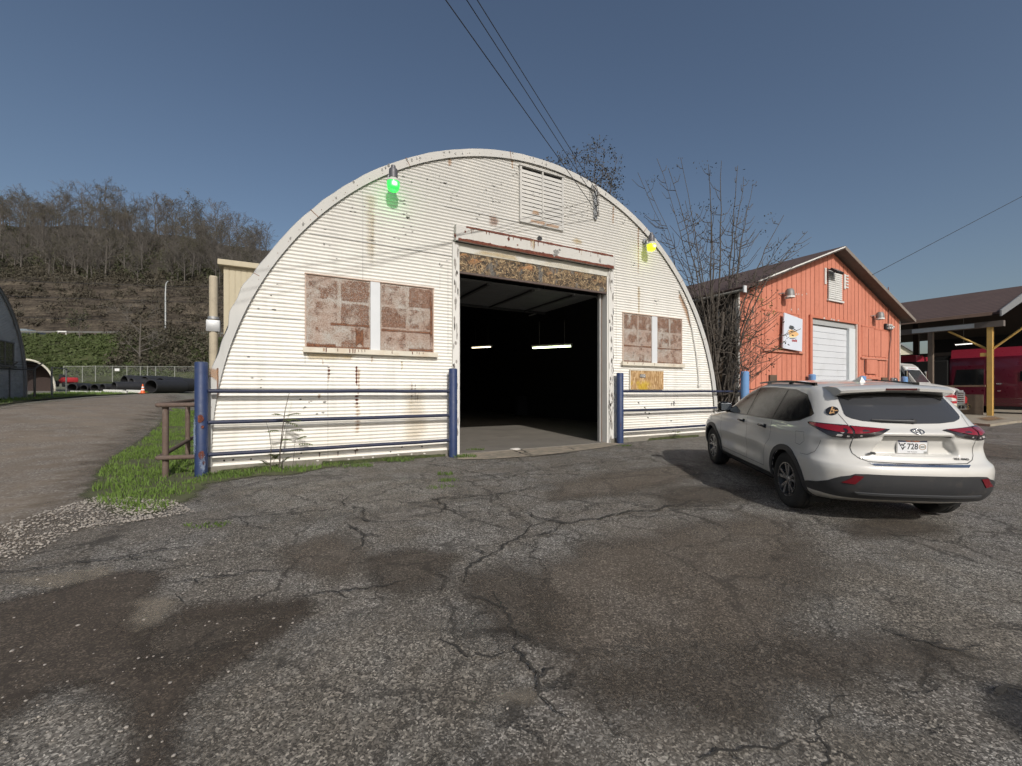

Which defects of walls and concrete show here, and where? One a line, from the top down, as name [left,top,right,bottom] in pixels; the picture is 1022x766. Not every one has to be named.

rust [307,281,372,429]
rust [382,285,433,354]
crack [0,446,711,717]
crack [697,695,857,766]